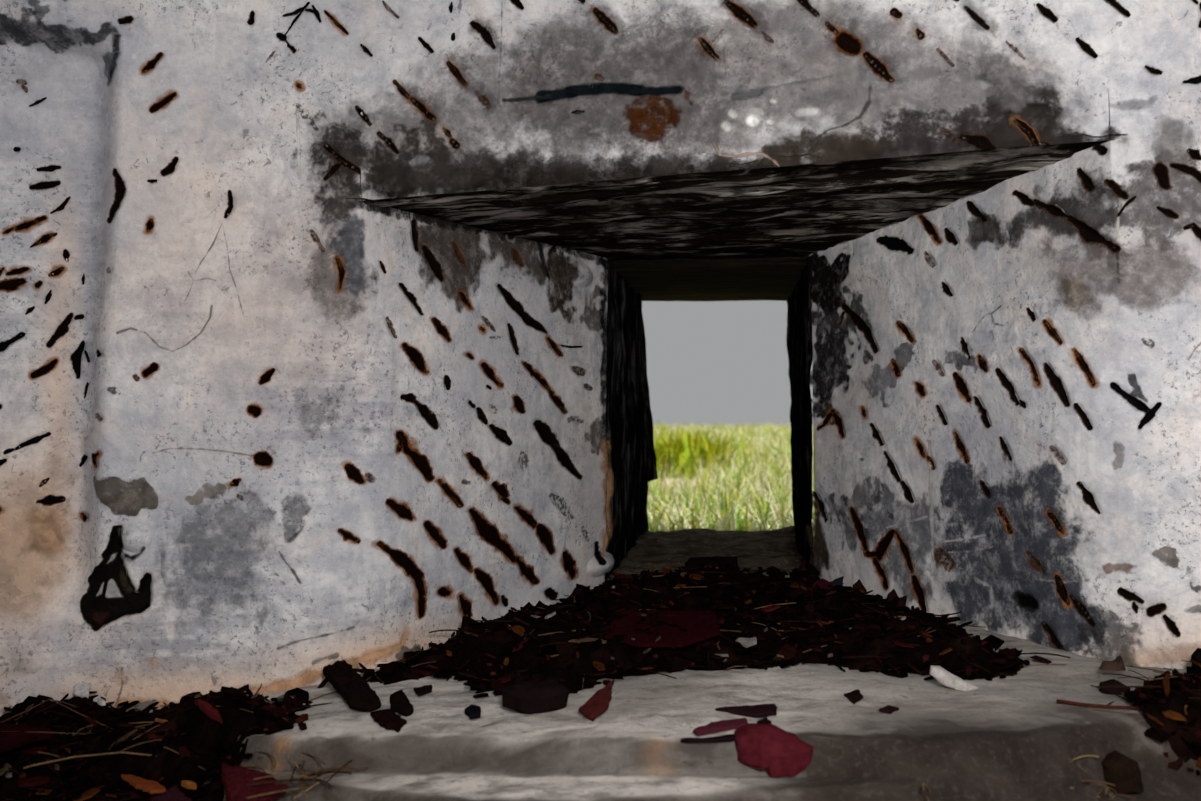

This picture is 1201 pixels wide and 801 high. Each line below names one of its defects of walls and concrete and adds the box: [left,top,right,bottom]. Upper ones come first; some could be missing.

rust [626,88,692,142]
leakage [722,110,774,131]
leakage [794,108,818,117]
crack [116,231,242,352]
spalling [79,450,158,631]
leakage [825,453,1201,667]
rust [437,586,454,598]
rust [545,587,558,600]